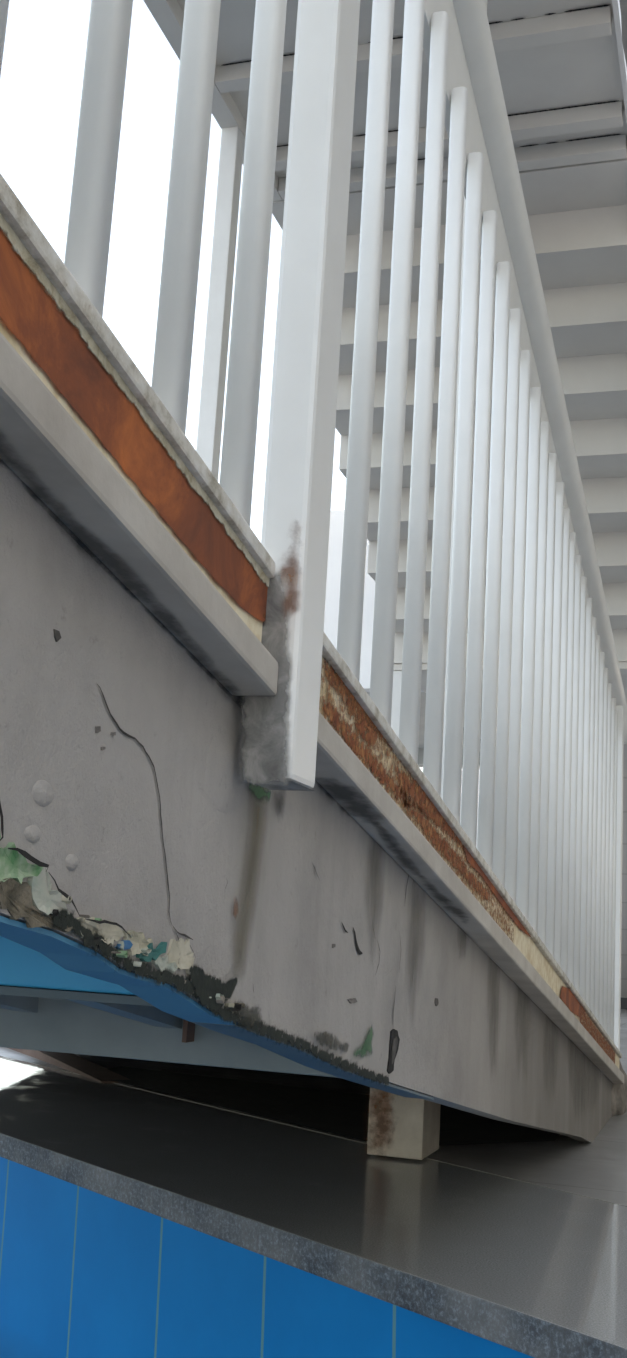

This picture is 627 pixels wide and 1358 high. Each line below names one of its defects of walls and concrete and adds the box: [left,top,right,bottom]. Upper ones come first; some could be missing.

corrosion [0,213,297,622]
crack [97,684,196,964]
peeling [0,802,389,1086]
corrosion [370,1092,392,1146]
corrosion [319,659,532,942]
corrosion [560,986,615,1064]